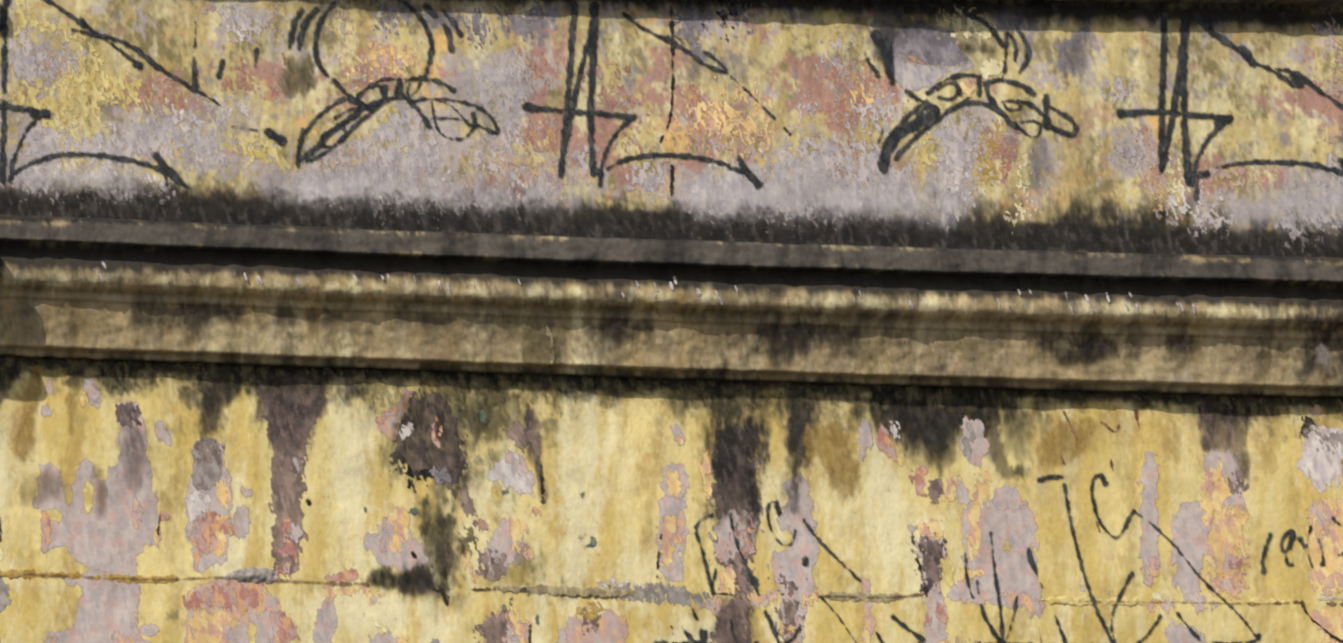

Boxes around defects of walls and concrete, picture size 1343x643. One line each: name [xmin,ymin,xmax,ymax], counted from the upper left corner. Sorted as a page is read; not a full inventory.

damp [0,164,1343,258]
damp [182,302,229,329]
crack [22,573,230,581]
peeling [33,372,450,643]
crack [274,578,369,586]
damp [420,499,455,576]
peeling [375,388,542,583]
crack [433,586,527,594]
damp [0,355,1343,523]
peeling [556,452,822,643]
crack [819,558,928,599]
peeling [1296,404,1343,643]